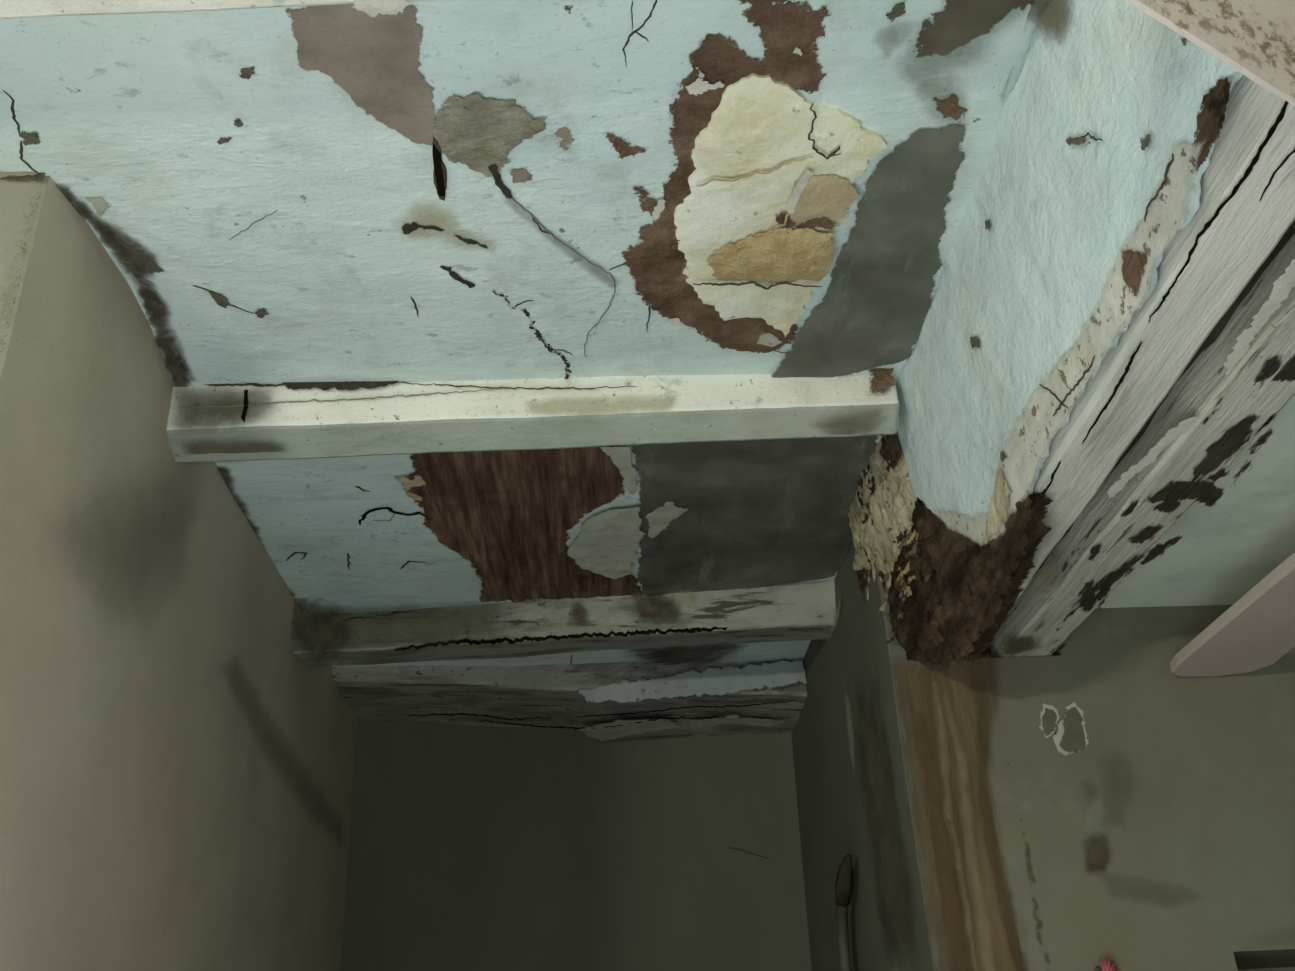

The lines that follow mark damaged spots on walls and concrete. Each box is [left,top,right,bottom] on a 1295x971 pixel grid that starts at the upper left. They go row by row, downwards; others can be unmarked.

crack [3,90,39,174]
peeling [285,0,447,201]
crack [174,160,638,408]
crack [622,0,657,65]
flaking render [622,0,830,354]
crack [937,101,1295,545]
flaking render [1121,249,1147,297]
flaking render [1191,77,1234,172]
crack [286,552,307,561]
crack [347,486,431,570]
flaking render [821,412,917,604]
peeling [1046,343,1295,657]